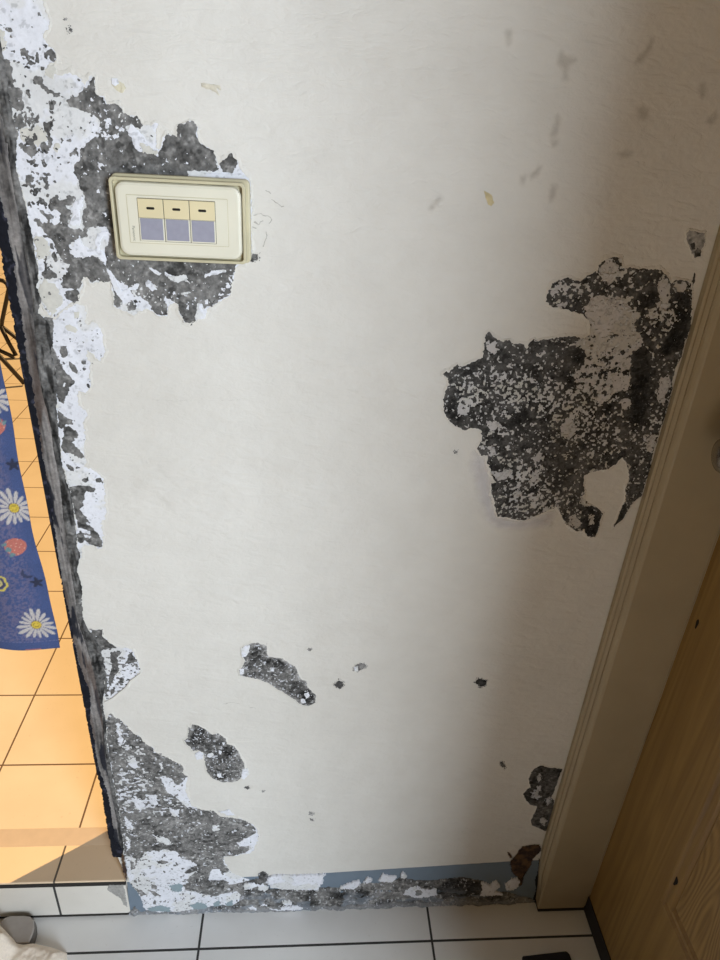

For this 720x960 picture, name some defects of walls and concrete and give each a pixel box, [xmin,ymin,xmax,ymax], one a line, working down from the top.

spalling [684,228,707,260]
spalling [440,252,695,539]
peeling [0,0,535,917]
spalling [521,764,563,831]
rust [507,844,541,886]